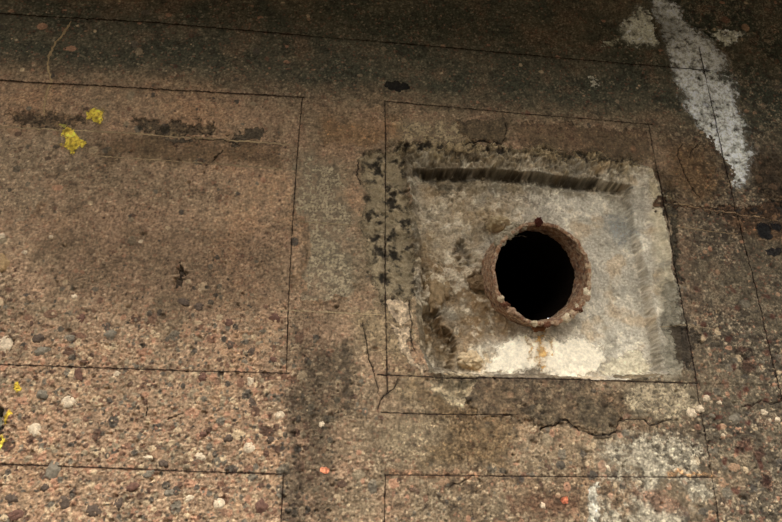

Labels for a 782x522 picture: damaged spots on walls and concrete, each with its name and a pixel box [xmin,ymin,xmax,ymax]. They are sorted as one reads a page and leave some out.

spalling [357,117,644,374]
rust [497,295,516,315]
rust [530,294,591,371]
peeling [466,367,625,439]
crack [538,419,677,436]
peeling [613,373,663,384]